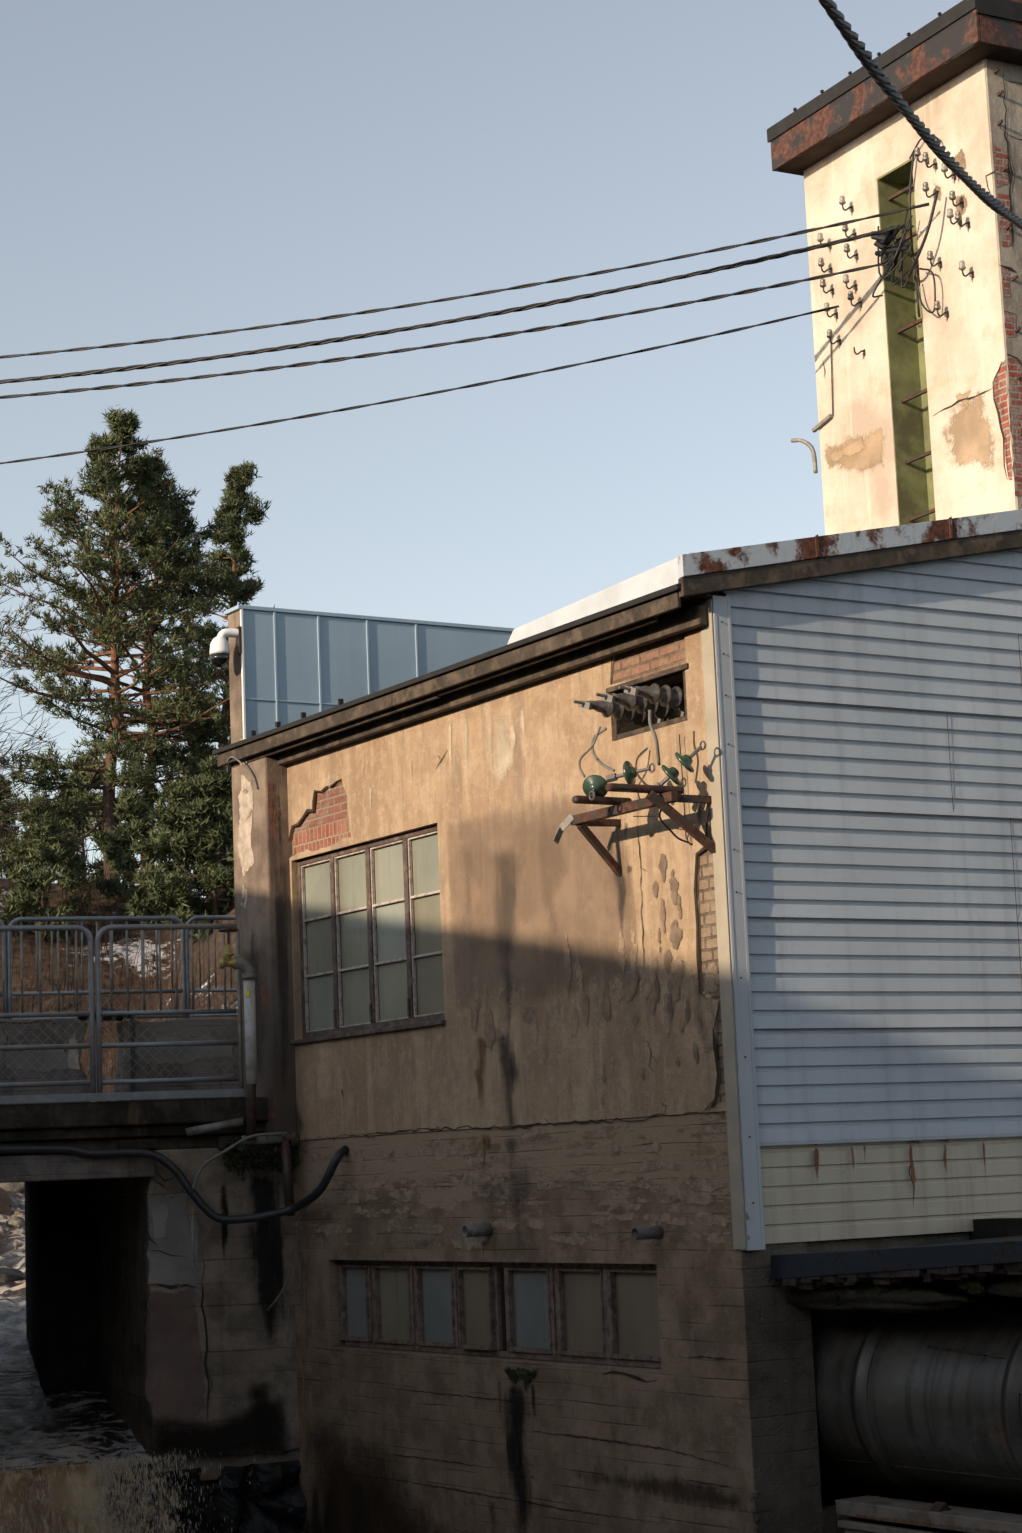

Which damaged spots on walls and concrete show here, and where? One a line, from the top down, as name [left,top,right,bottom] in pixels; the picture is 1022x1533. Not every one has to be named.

flaking render [994,146,1014,247]
flaking render [992,265,1022,497]
flaking render [237,758,368,908]
damp [449,805,634,1004]
flaking render [652,830,726,1103]
damp [300,1441,429,1533]
damp [499,1385,534,1529]